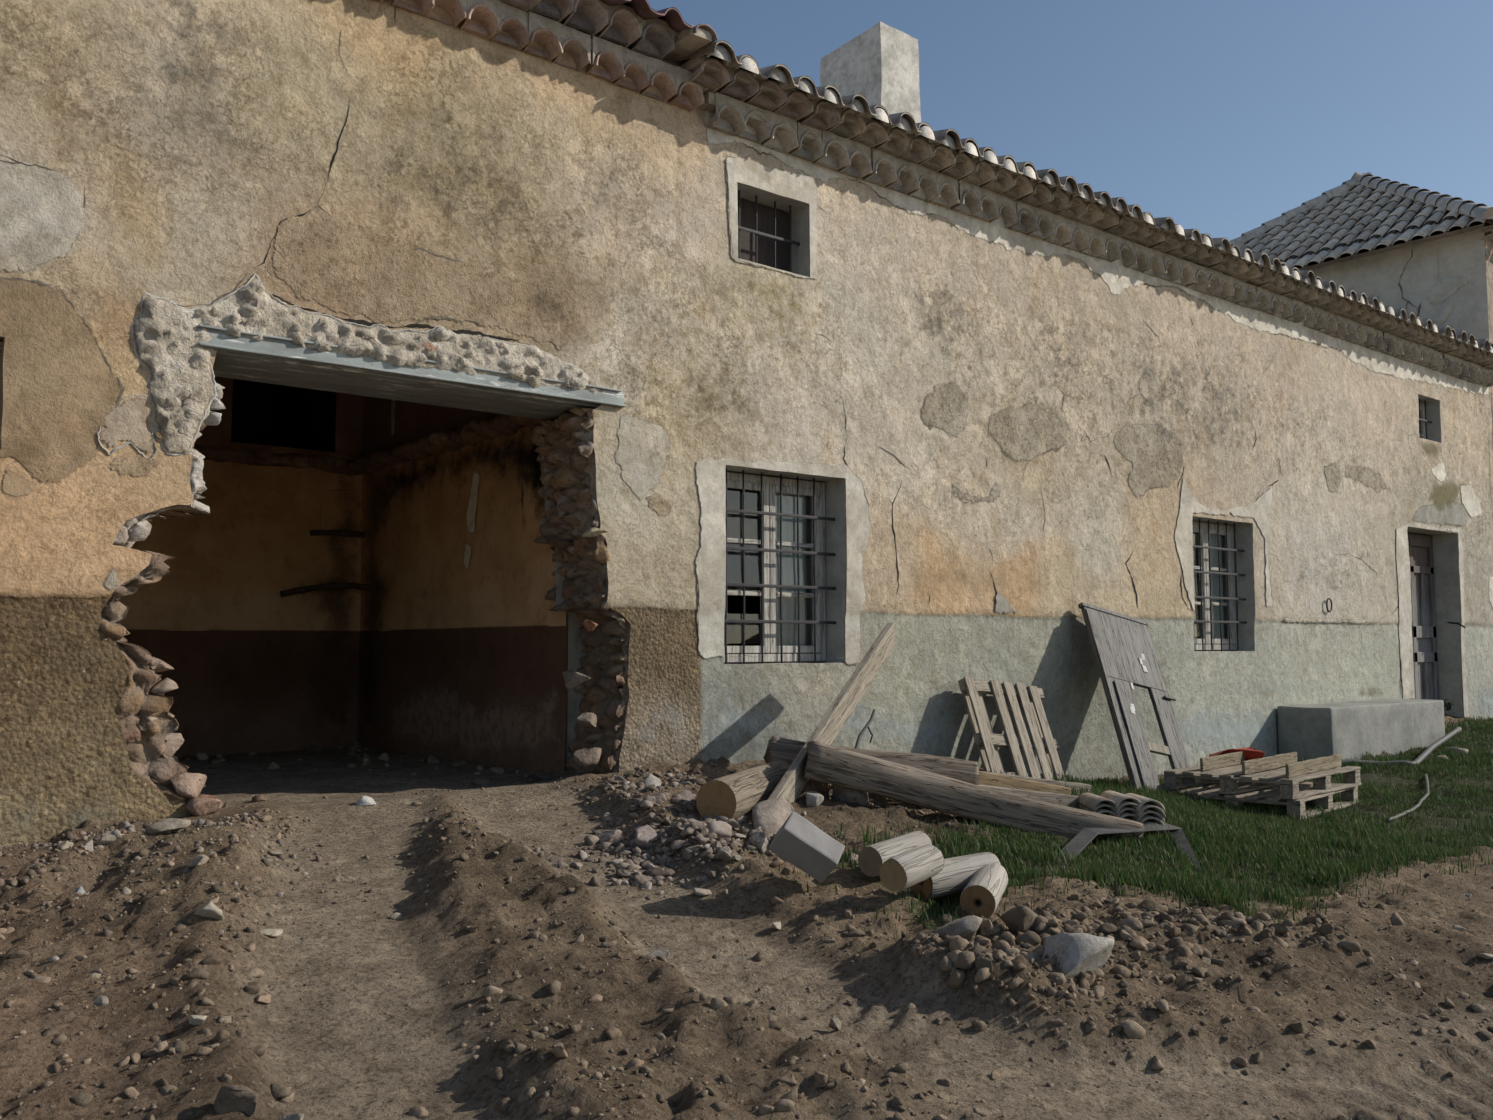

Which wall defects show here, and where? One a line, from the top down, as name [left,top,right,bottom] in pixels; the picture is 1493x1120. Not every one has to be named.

crack [174,30,528,344]
peeling [703,110,1489,395]
spalling [0,160,601,485]
peeling [921,381,970,437]
peeling [988,402,1069,462]
peeling [1432,461,1482,518]
spalling [149,657,178,695]
spalling [145,714,184,756]
spalling [170,773,223,816]